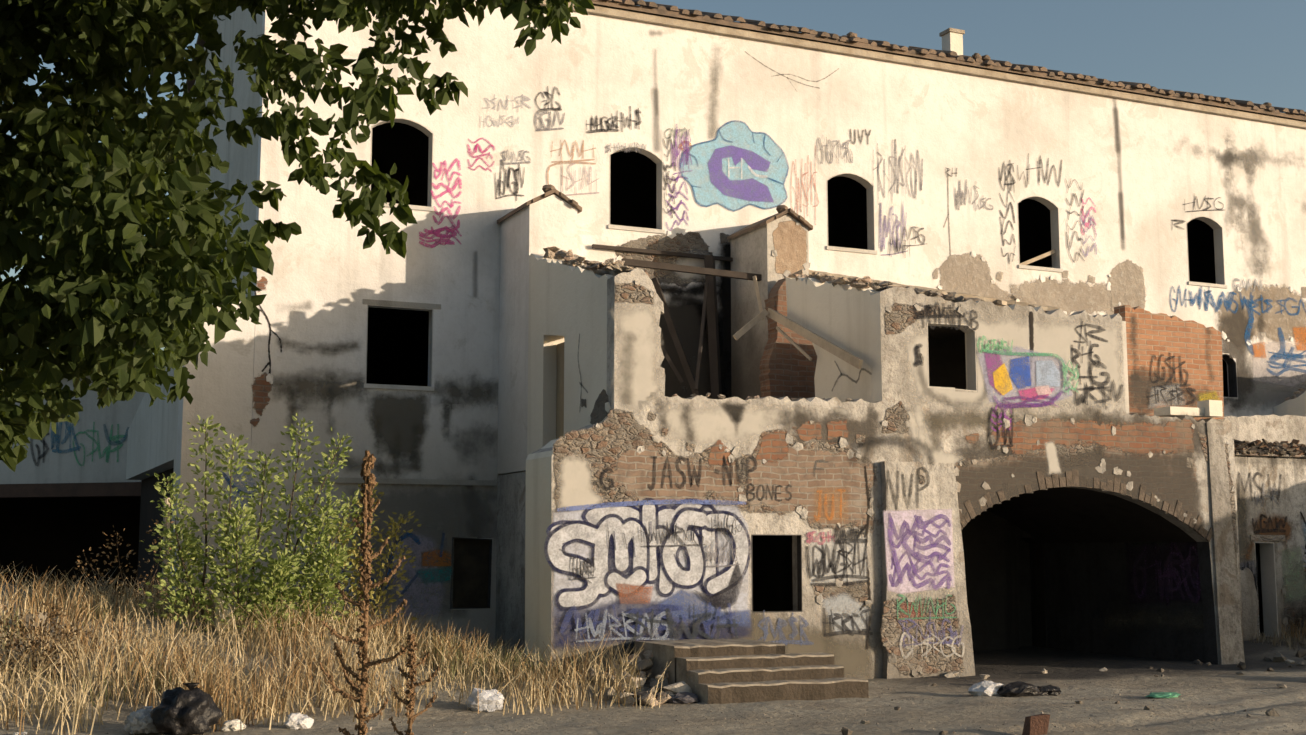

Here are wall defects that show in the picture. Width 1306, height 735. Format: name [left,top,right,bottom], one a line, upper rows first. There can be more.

flaking render [772,221,811,277]
leakage [1219,153,1266,264]
flaking render [250,373,273,427]
leakage [309,343,357,353]
leakage [274,374,496,472]
flaking render [553,231,876,531]
peeling [881,251,1209,506]
flaking render [1218,283,1306,346]
flaking render [1224,437,1241,591]
flaking render [812,578,964,677]